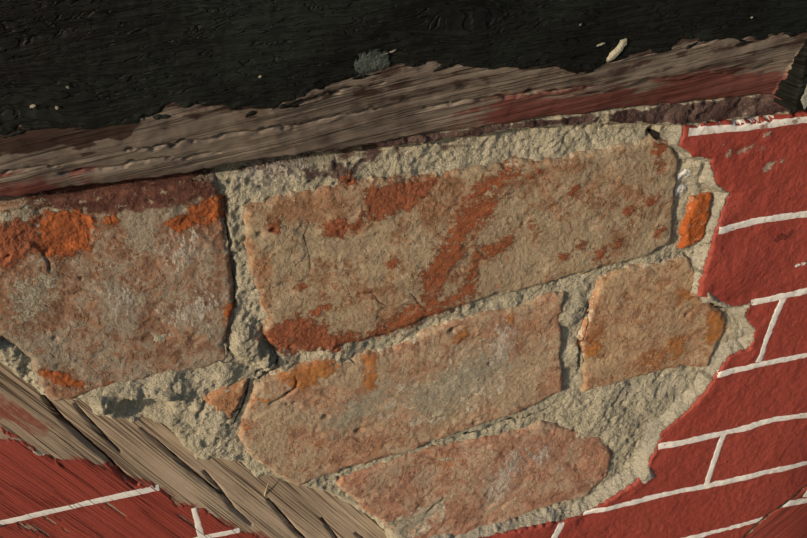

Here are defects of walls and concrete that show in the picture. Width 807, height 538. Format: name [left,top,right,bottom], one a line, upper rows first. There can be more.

peeling [433,61,461,72]
peeling [722,119,772,158]
spalling [163,189,228,233]
spalling [321,171,437,240]
spalling [0,208,121,271]
spalling [40,370,85,390]
spalling [255,303,359,390]
spalling [361,352,378,390]
spalling [429,121,756,538]
crack [743,485,807,538]